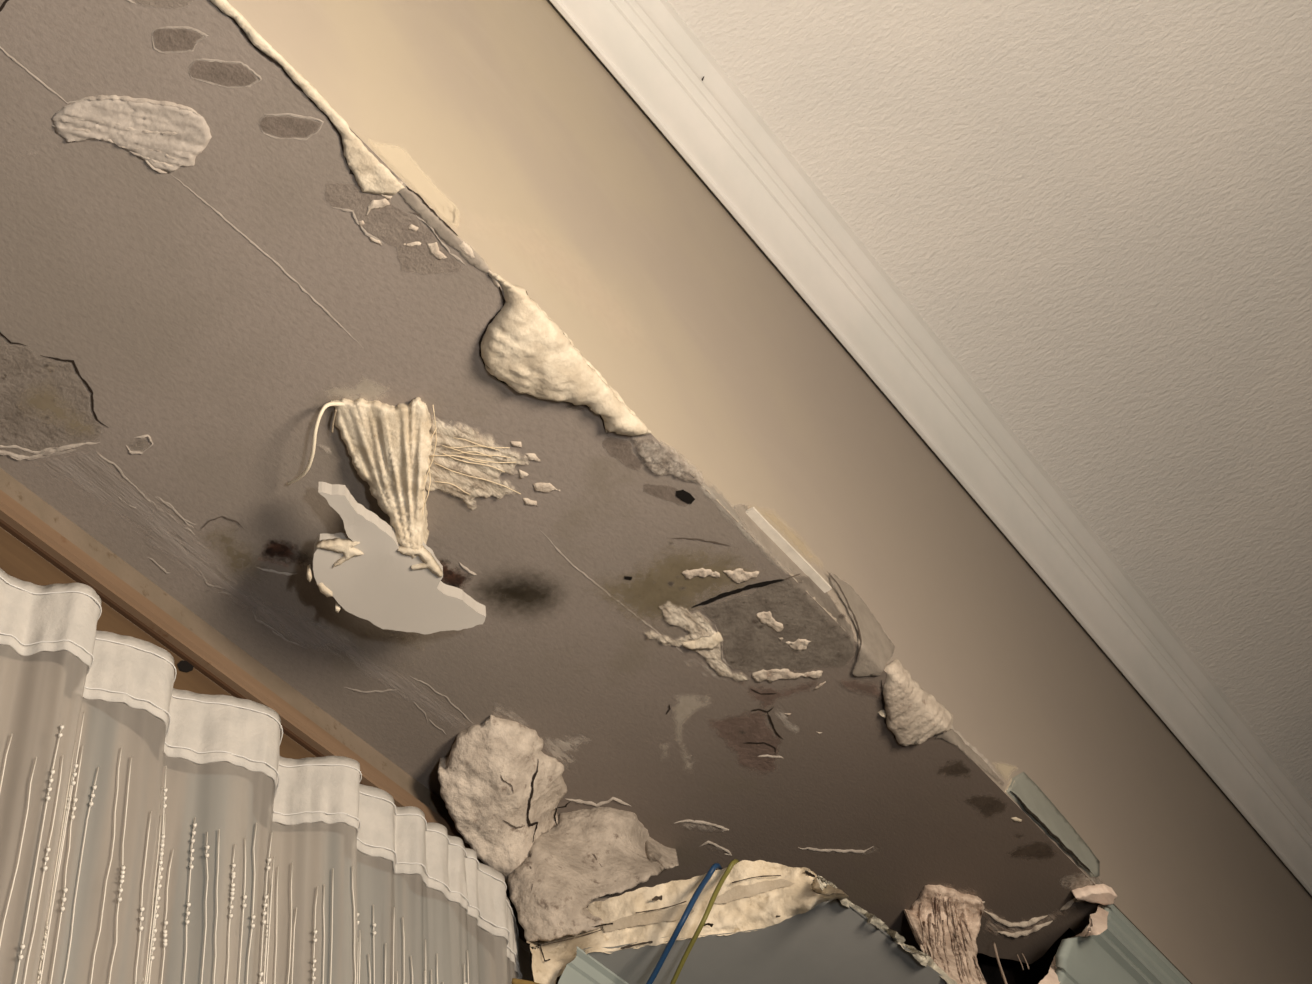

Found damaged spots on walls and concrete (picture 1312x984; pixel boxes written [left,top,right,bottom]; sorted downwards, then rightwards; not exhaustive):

peeling [152,26,262,88]
peeling [258,113,324,140]
leakage [603,538,752,620]
spalling [602,436,1006,818]
crack [501,760,571,891]
peeling [1011,834,1055,860]
spalling [526,860,957,984]
spalling [1061,873,1117,939]
spalling [1039,954,1061,984]